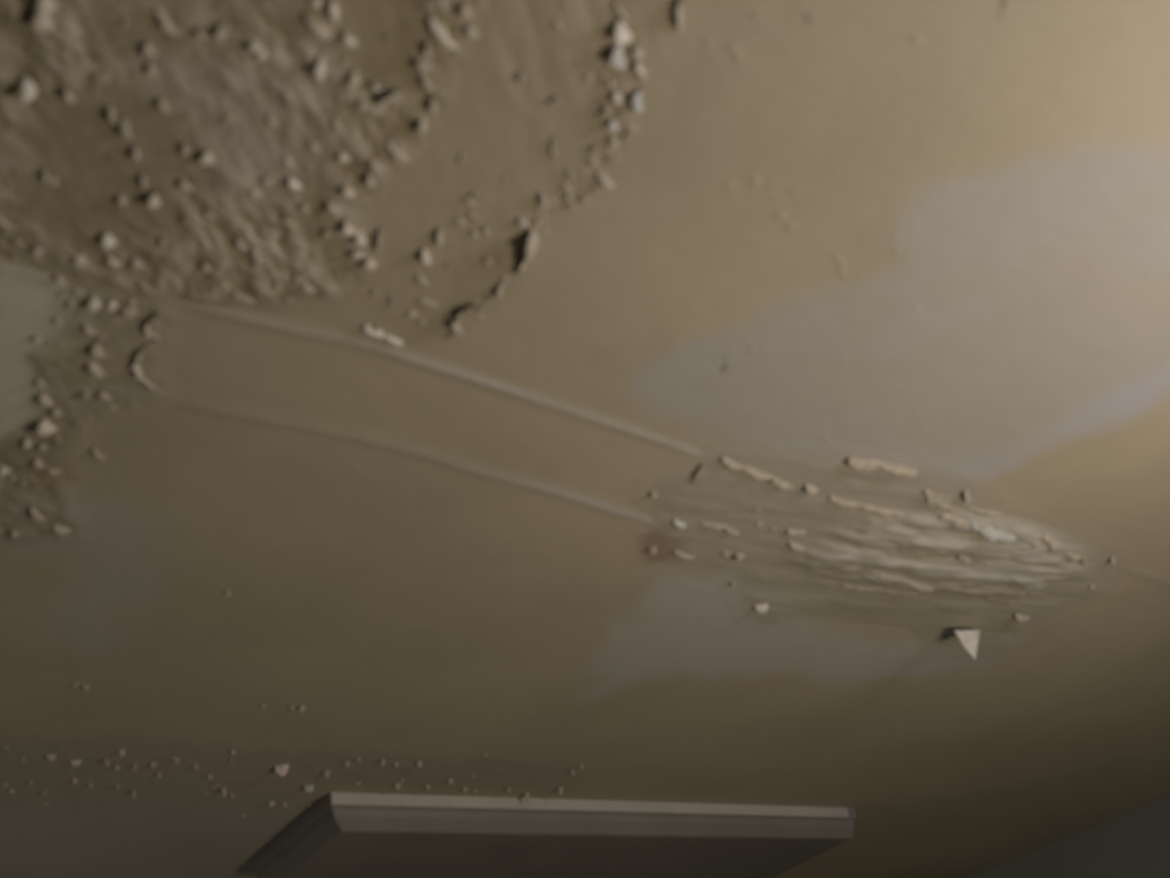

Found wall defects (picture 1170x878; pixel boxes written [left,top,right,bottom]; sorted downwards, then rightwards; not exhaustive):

peeling [0,0,709,549]
leakage [585,105,1170,487]
leakage [539,557,1068,716]
flaking render [622,436,1141,669]
peeling [0,697,612,835]